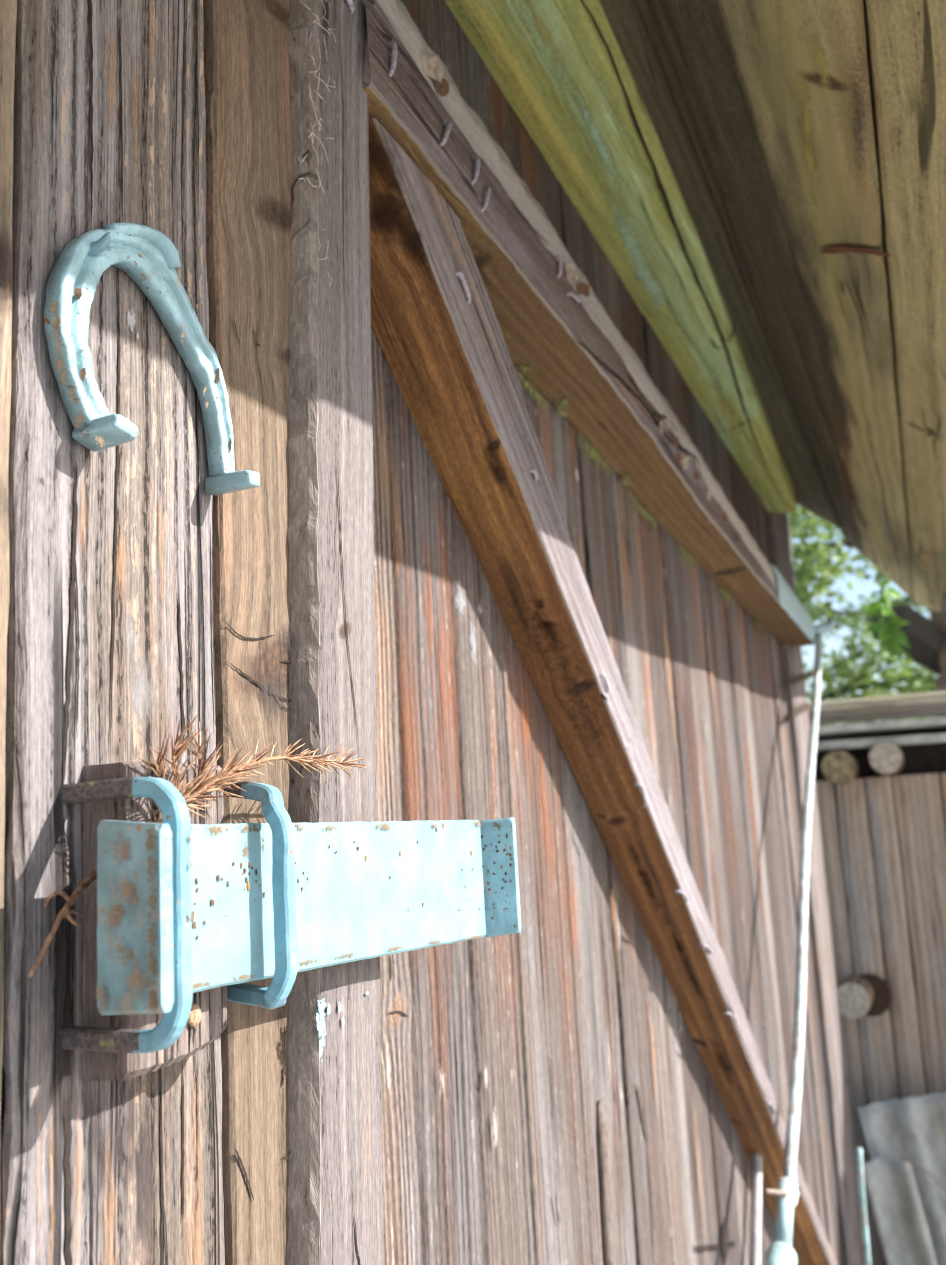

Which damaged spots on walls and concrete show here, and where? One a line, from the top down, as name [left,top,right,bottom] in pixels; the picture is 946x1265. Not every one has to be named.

crack [193,0,201,186]
crack [572,0,768,474]
crack [177,591,185,743]
crack [212,522,292,732]
peeling [316,998,345,1062]
crack [234,1148,254,1201]